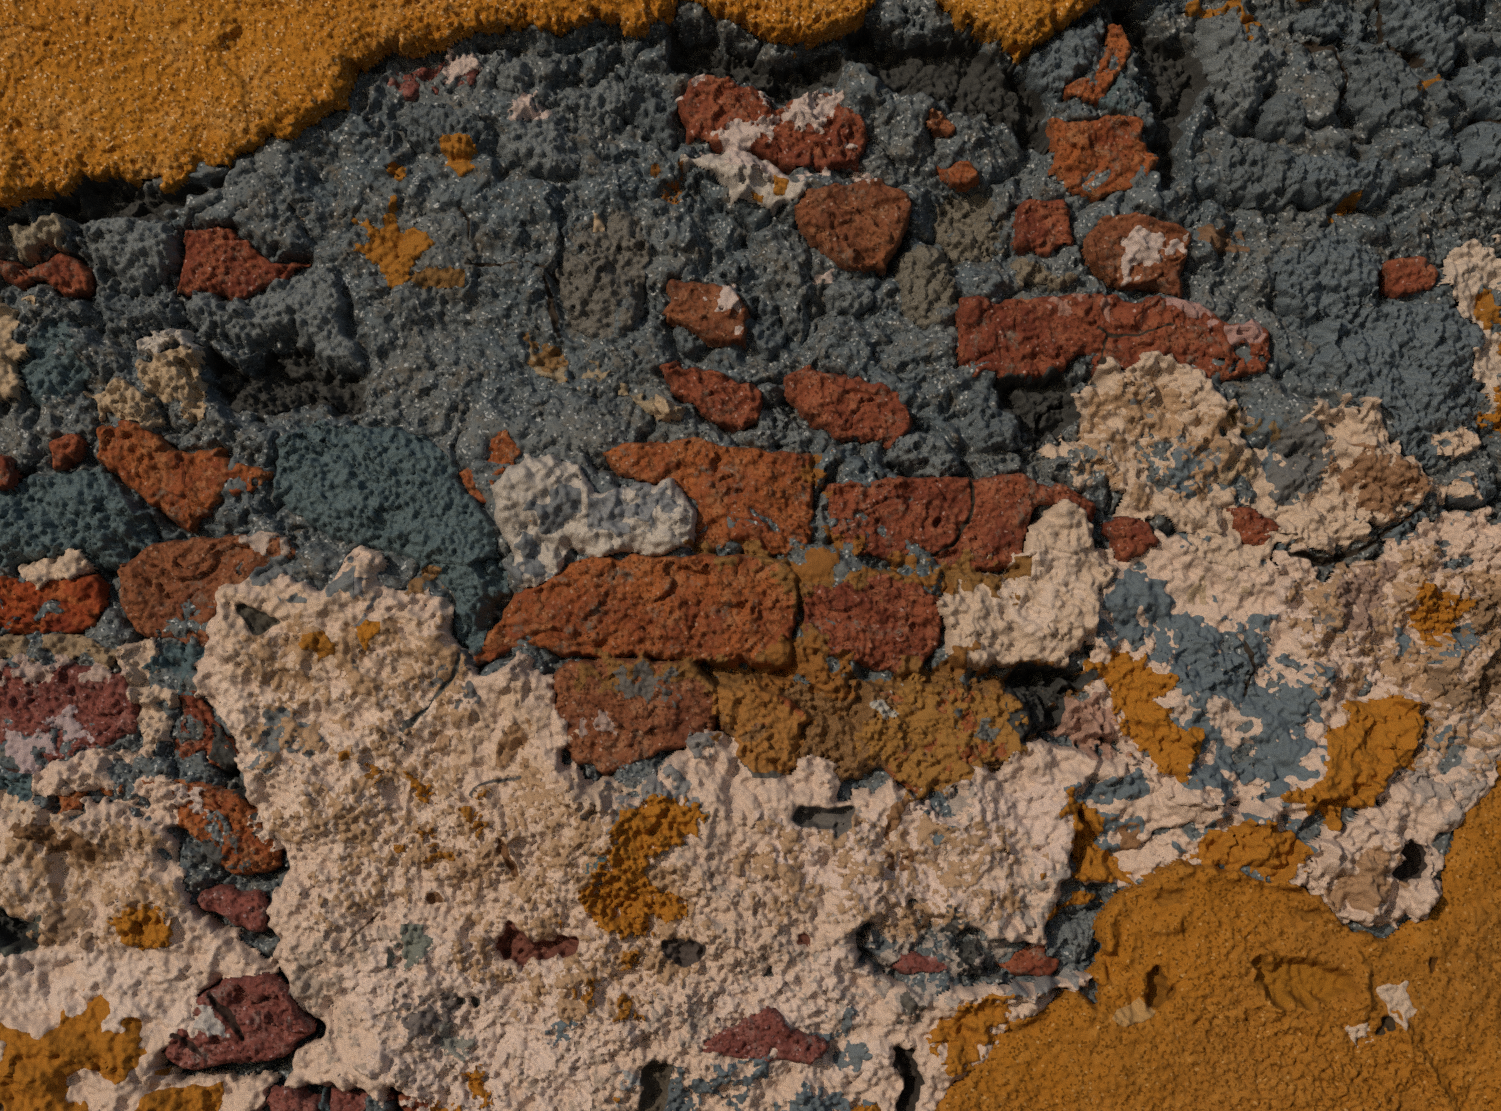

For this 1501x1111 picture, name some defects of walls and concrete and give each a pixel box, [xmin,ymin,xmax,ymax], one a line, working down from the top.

peeling [1184,0,1262,41]
peeling [1417,74,1442,97]
peeling [439,133,478,177]
peeling [680,152,809,216]
peeling [347,162,433,289]
peeling [593,212,605,233]
peeling [1327,190,1363,223]
peeling [0,234,1501,1111]